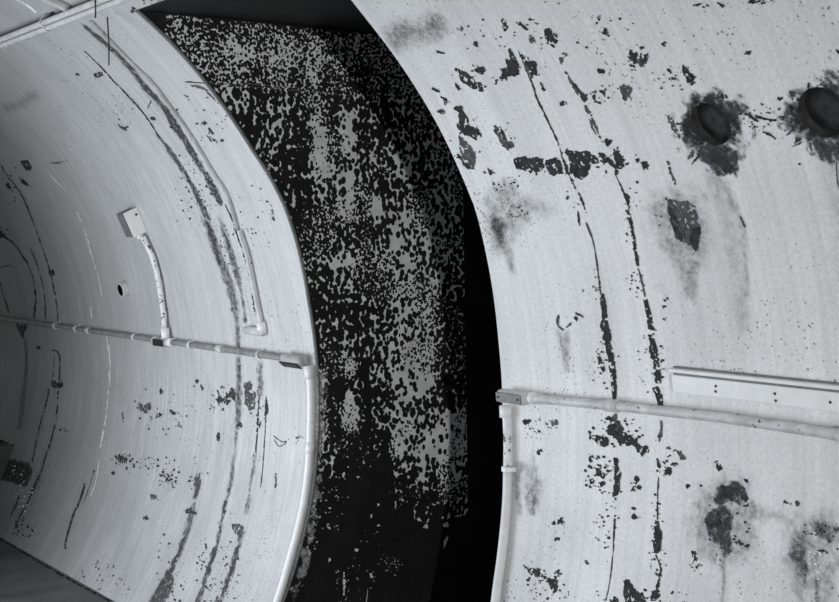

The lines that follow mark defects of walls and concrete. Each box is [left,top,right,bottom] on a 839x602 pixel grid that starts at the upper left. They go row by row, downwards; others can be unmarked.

peeling [452,18,567,92]
peeling [585,84,632,104]
peeling [627,46,649,71]
peeling [657,65,702,90]
peeling [493,122,516,151]
corrosion [667,71,839,186]
corrosion [655,197,701,252]
peeling [165,15,482,565]
peeling [111,453,180,488]
corrosion [704,479,751,561]
peeling [523,565,569,602]
leakage [788,523,839,594]